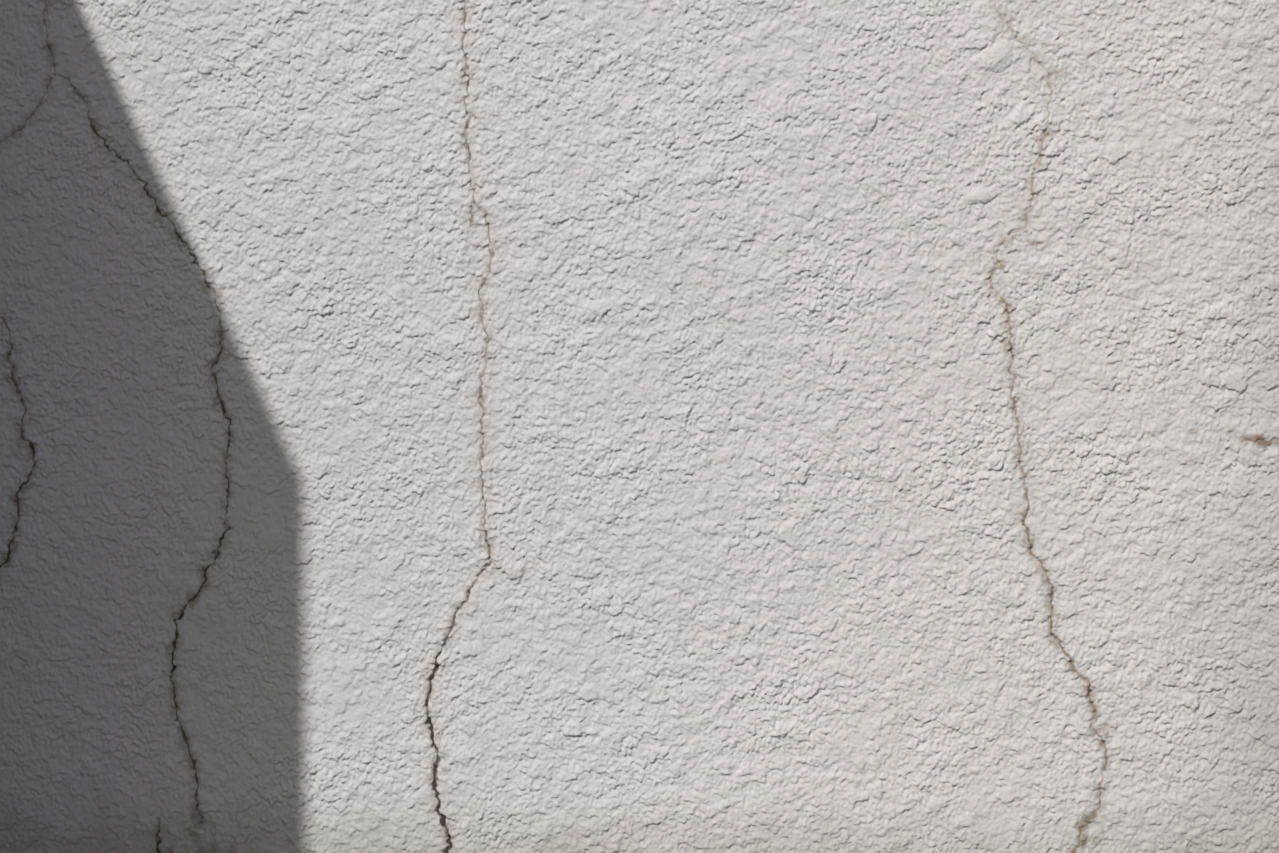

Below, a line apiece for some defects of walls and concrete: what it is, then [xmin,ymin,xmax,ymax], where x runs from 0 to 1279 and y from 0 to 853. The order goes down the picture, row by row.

crack [0,317,36,567]
crack [79,94,231,818]
crack [425,383,490,853]
crack [1019,453,1107,765]